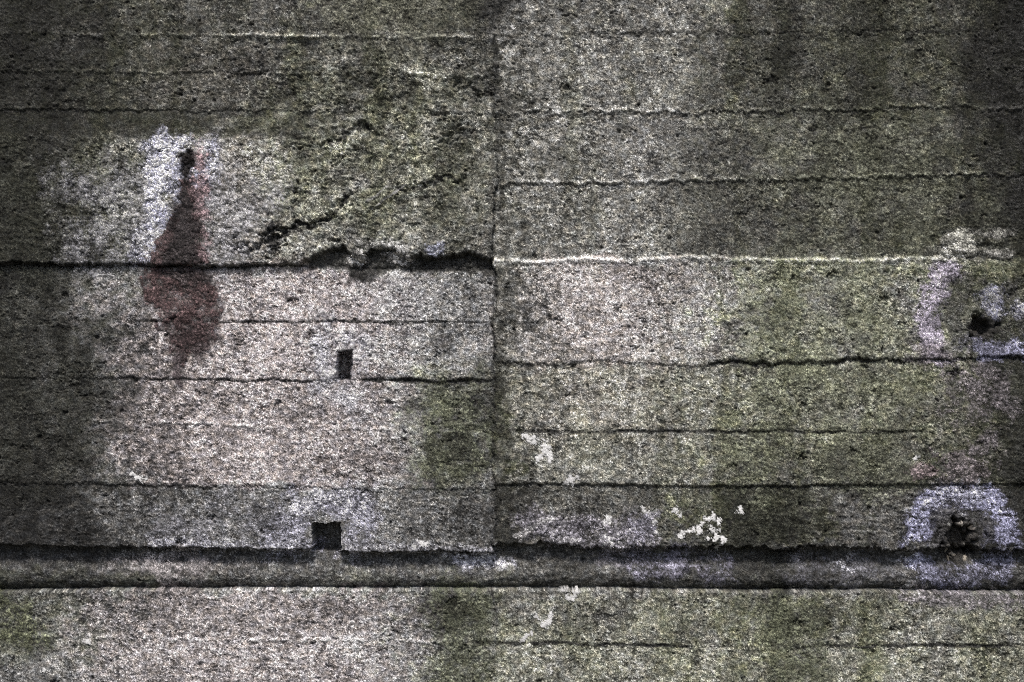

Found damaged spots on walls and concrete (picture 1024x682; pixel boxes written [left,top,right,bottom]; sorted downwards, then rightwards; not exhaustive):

leakage [972,0,1024,229]
corrosion [139,148,229,388]
spalling [307,238,493,282]
leakage [513,510,733,583]
leakage [815,260,1024,611]